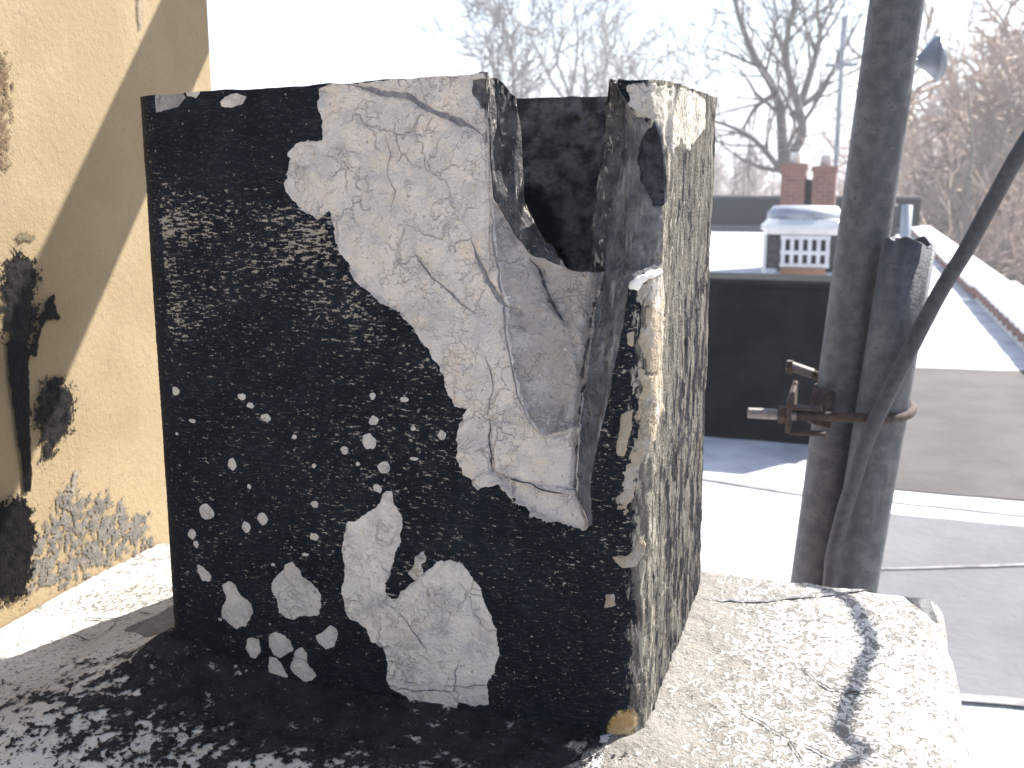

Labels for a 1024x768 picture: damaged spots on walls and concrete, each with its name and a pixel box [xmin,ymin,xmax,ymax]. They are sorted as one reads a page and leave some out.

peeling [155,91,200,113]
peeling [220,93,246,108]
spalling [284,73,604,531]
peeling [616,266,666,515]
peeling [238,393,271,422]
peeling [199,504,214,520]
peeling [242,513,268,533]
peeling [271,553,321,620]
peeling [341,461,499,708]
crack [705,589,878,602]
peeling [197,565,316,682]
peeling [316,626,338,649]